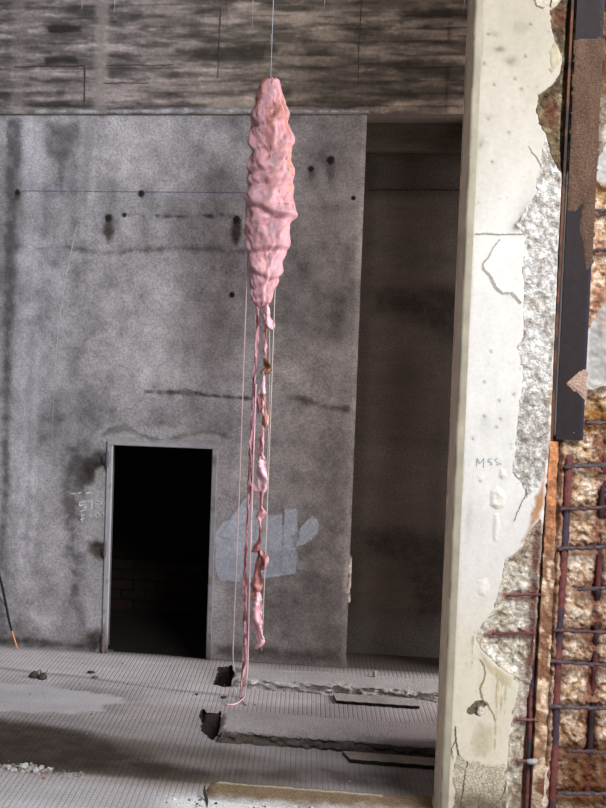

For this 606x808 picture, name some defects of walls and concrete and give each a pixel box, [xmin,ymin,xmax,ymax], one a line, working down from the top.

crack [475,233,525,304]
spalling [512,0,606,808]
corrosion [529,441,559,808]
crack [479,659,496,722]
spalling [452,519,542,808]
crack [451,726,460,757]
corrosion [565,744,606,804]